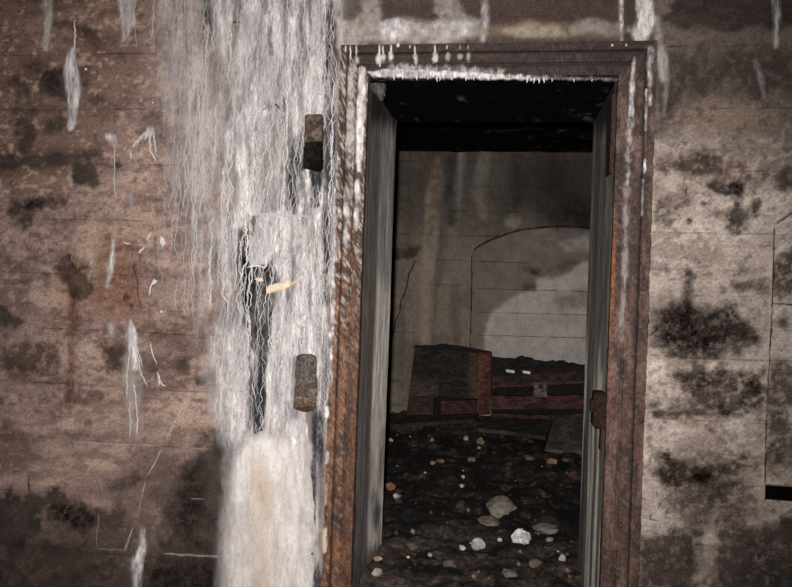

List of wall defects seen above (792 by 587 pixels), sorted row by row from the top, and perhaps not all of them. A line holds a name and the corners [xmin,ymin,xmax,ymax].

damp [28,23,94,131]
damp [0,109,99,188]
damp [659,152,761,234]
damp [130,0,486,587]
crack [393,262,415,334]
damp [773,251,792,295]
damp [103,320,147,433]
damp [652,361,792,463]
damp [0,488,124,587]
damp [639,449,792,587]